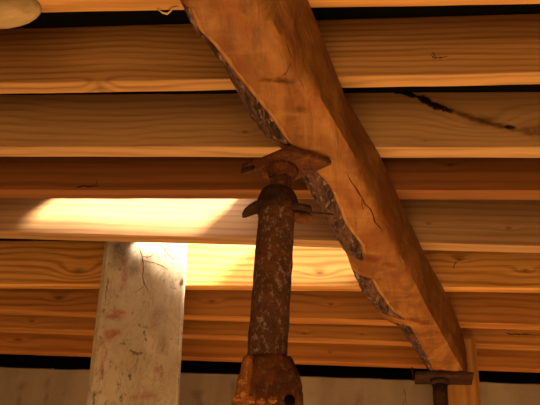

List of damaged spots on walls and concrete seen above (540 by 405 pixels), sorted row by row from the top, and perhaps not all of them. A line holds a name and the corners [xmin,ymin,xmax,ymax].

crack [395,92,515,129]
crack [347,174,382,231]
crack [135,247,182,293]
rust [232,379,278,405]